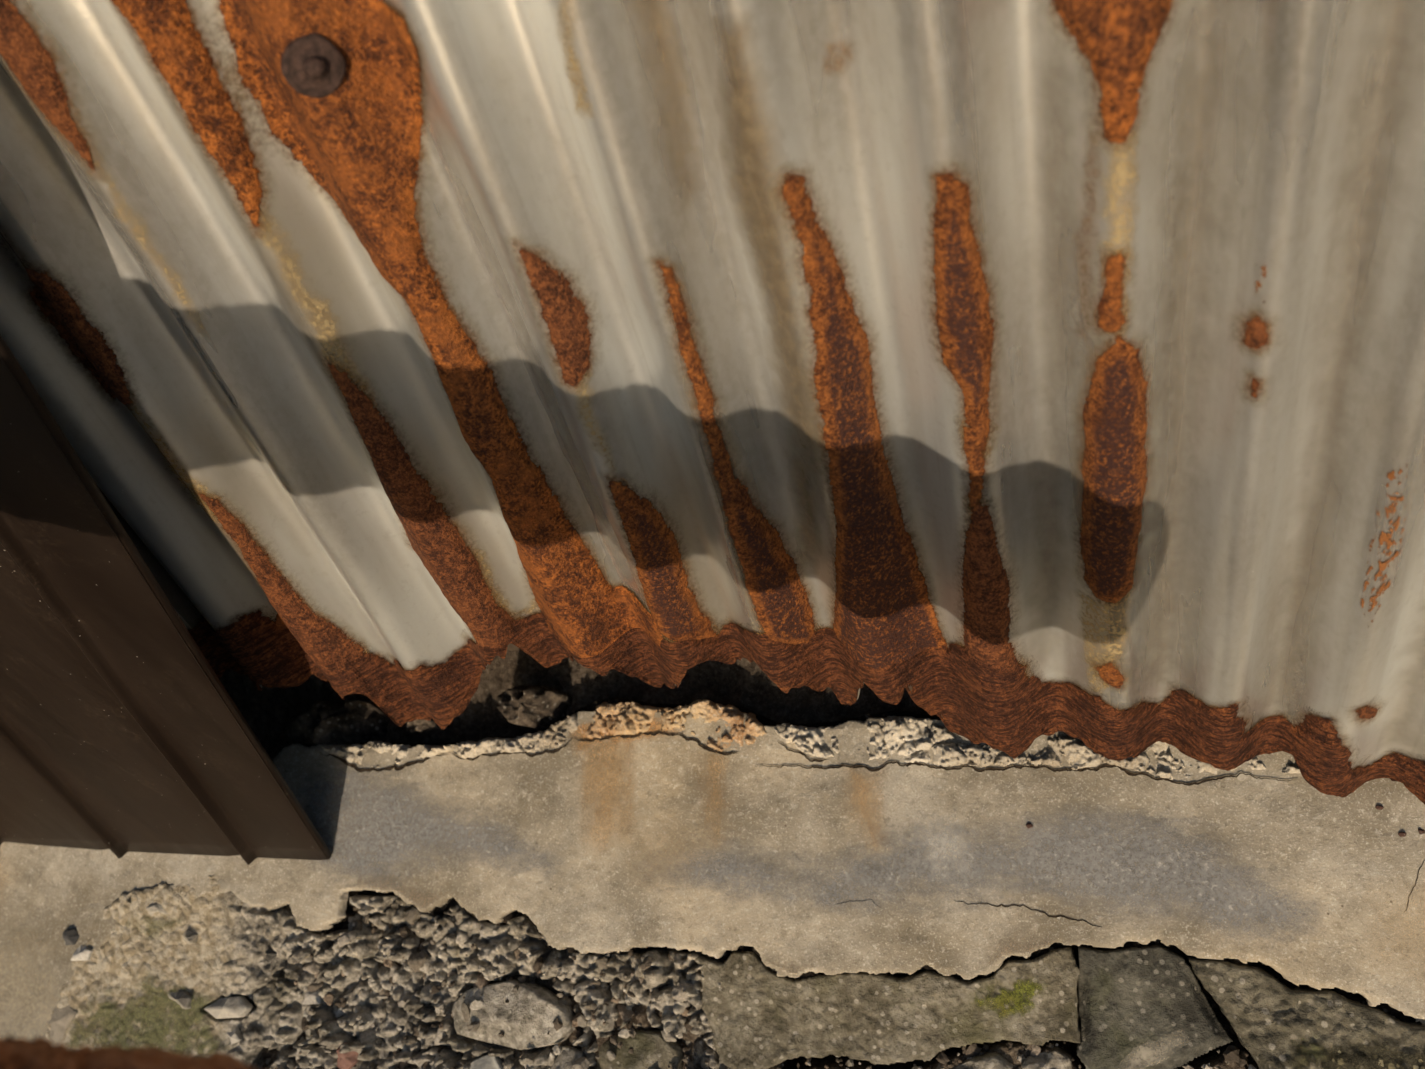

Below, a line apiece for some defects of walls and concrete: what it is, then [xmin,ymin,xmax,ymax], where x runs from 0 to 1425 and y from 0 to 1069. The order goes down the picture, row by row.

rust [0,0,95,172]
rust [25,0,1425,804]
crack [320,731,1299,786]
spalling [45,875,1081,1069]